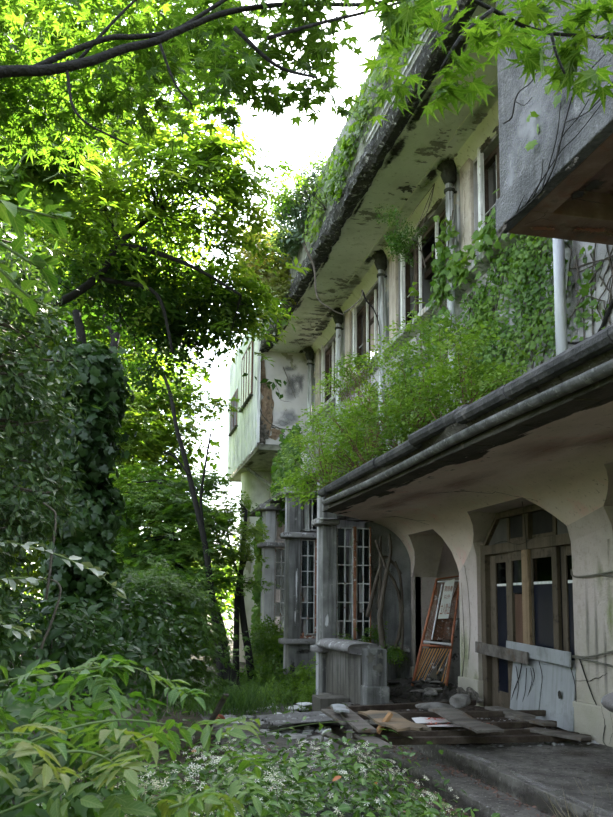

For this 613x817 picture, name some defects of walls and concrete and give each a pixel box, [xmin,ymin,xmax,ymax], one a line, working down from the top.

water stain [443,36,469,68]
water stain [385,92,434,168]
spalling [259,356,283,444]
water stain [286,367,302,396]